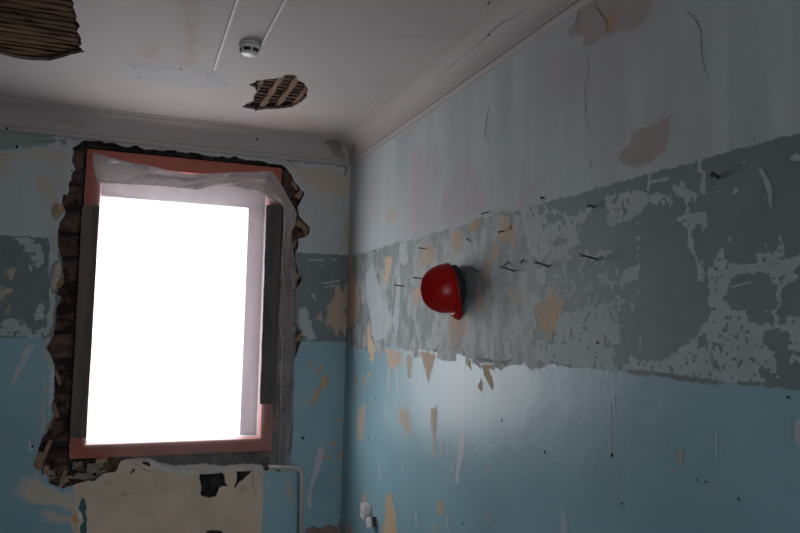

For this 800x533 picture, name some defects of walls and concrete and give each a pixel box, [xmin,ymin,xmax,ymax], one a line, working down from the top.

flaking render [0,0,81,58]
flaking render [566,0,656,49]
crack [686,10,709,80]
flaking render [246,75,308,109]
peeling [0,114,800,497]
flaking render [69,507,82,533]
flaking render [381,490,397,533]